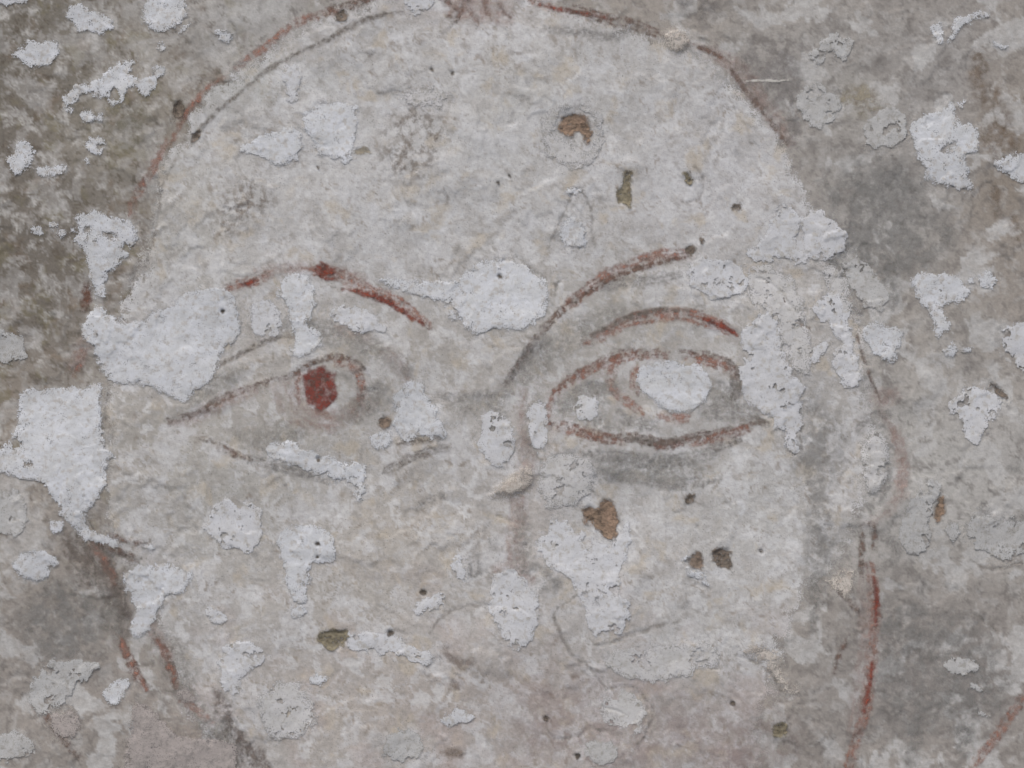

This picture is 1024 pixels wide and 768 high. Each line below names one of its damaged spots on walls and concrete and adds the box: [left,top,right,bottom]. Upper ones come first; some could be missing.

peeling [62,0,190,164]
peeling [239,99,370,169]
peeling [862,99,979,194]
peeling [378,255,551,337]
peeling [685,203,904,454]
peeling [909,269,998,358]
peeling [0,209,324,554]
peeling [948,383,1008,445]
peeling [266,440,367,502]
peeling [526,400,632,638]
peeling [121,541,194,639]
peeling [488,568,541,651]